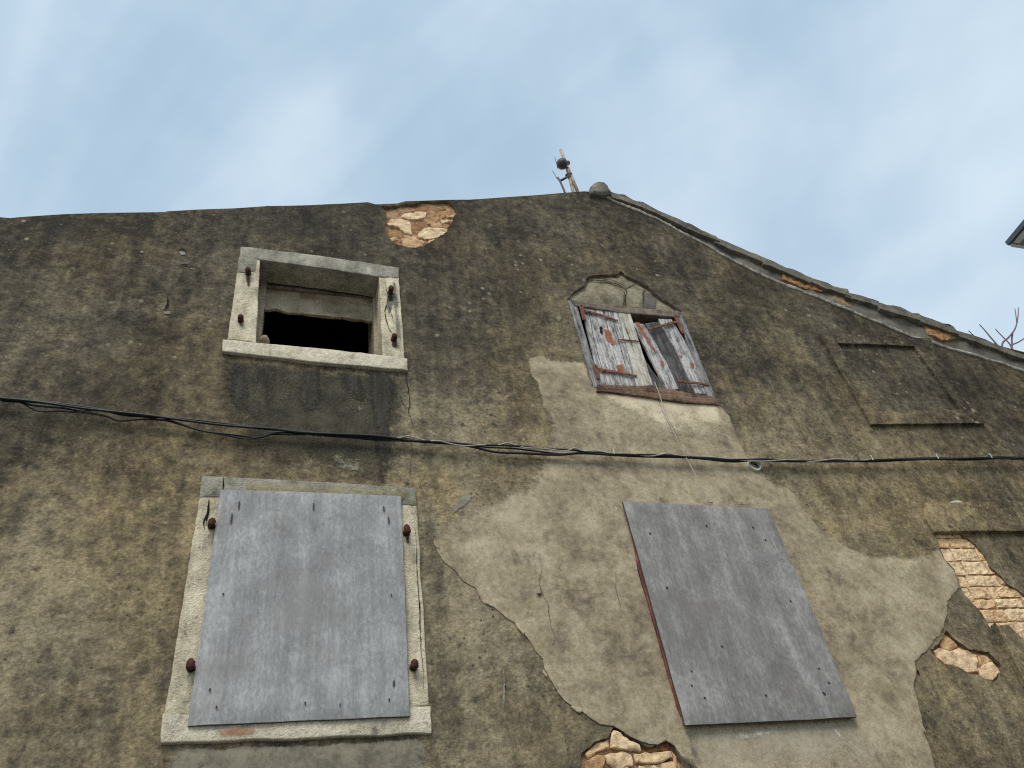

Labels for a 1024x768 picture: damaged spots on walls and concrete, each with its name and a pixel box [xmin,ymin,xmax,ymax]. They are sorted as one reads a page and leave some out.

spalling [385,204,456,248]
damp [222,361,404,483]
crack [537,554,621,645]
spalling [936,535,1024,639]
spalling [931,633,1000,682]
spalling [581,729,681,768]